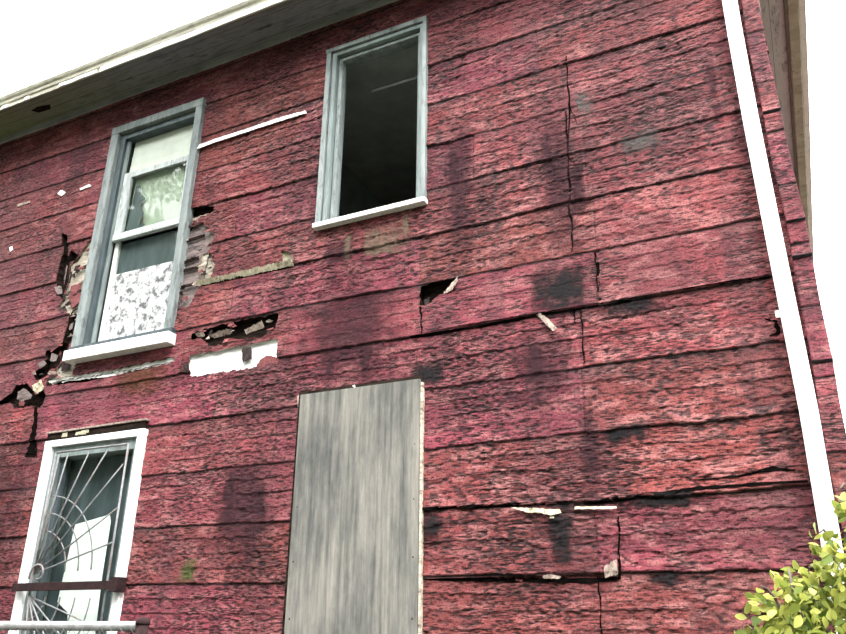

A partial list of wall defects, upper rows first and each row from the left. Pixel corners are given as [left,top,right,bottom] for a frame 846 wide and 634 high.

crack [565,56,577,252]
peeling [191,243,215,285]
crack [593,252,601,291]
peeling [17,264,87,406]
peeling [191,313,280,367]
crack [573,307,585,368]